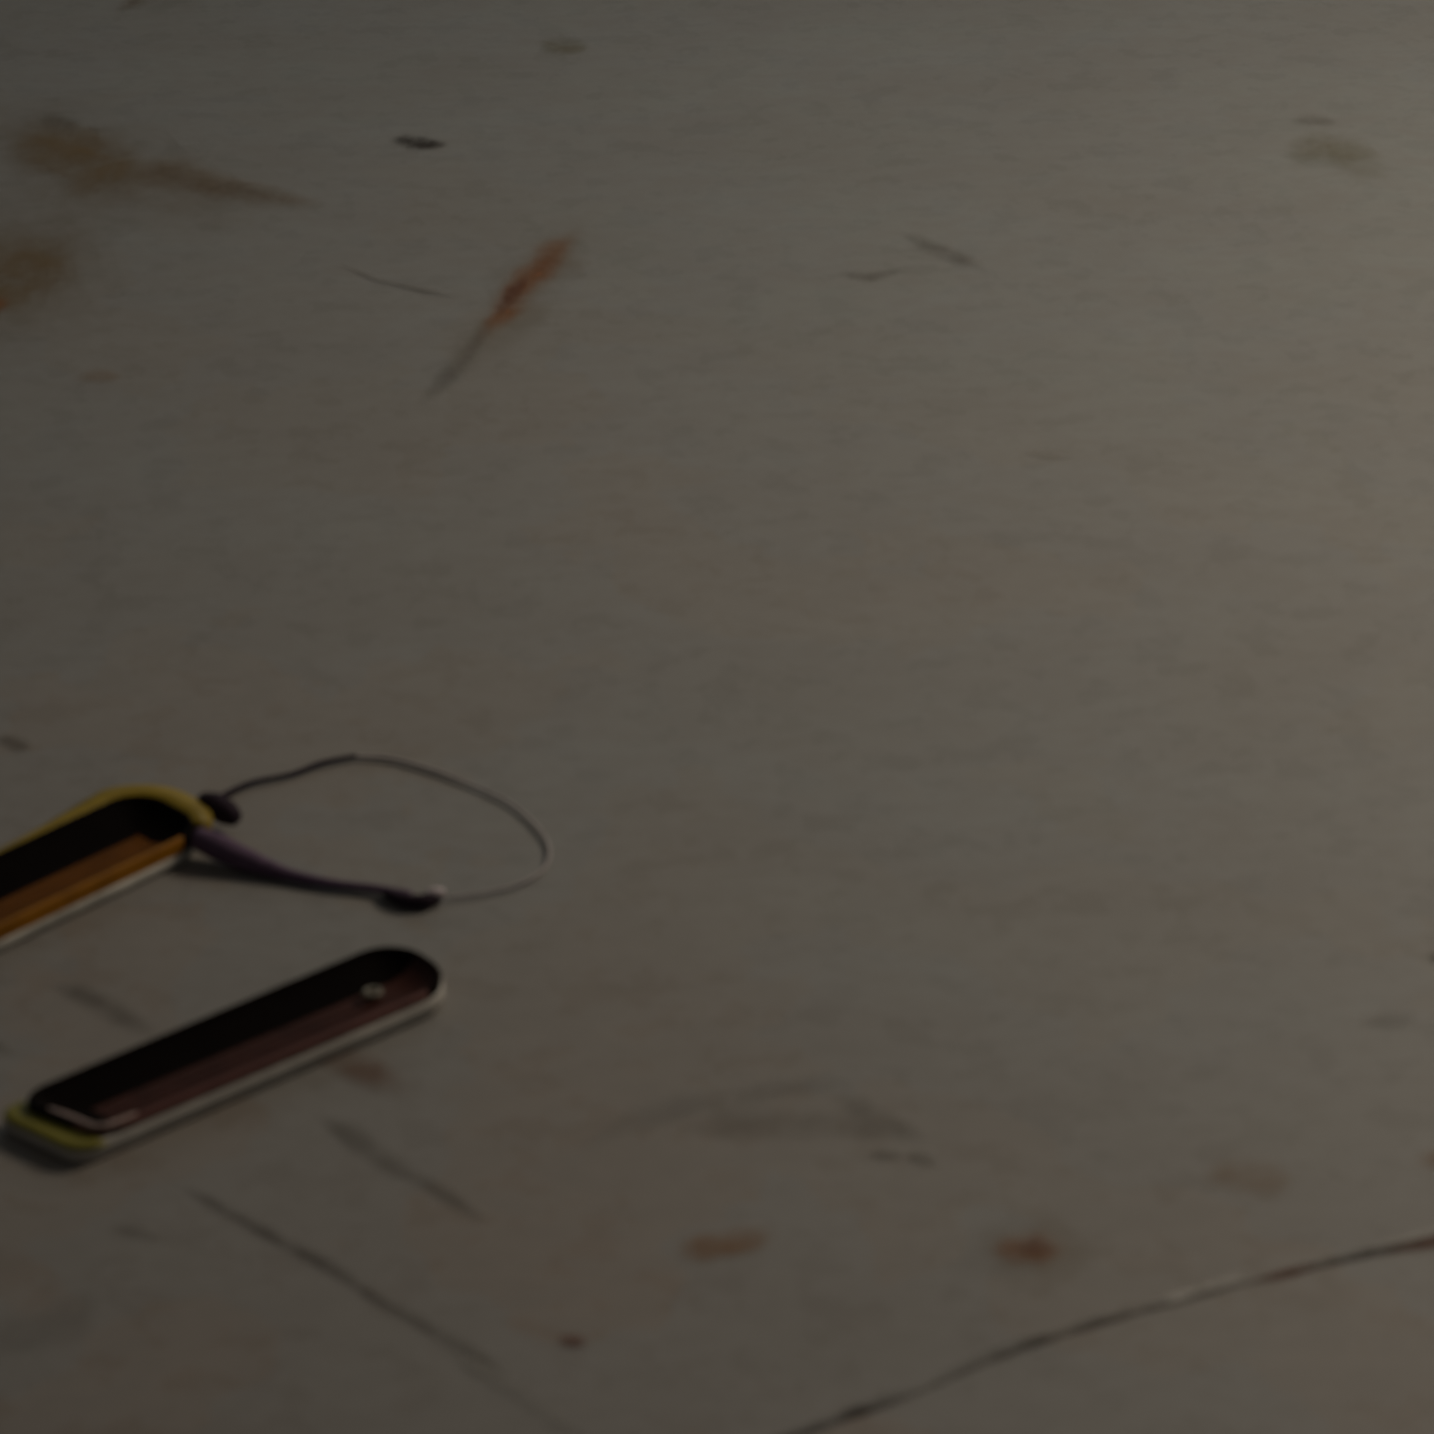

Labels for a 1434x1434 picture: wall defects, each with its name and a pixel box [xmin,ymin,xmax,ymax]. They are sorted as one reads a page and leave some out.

crack [1277,1230,1434,1276]
crack [800,1406,872,1433]